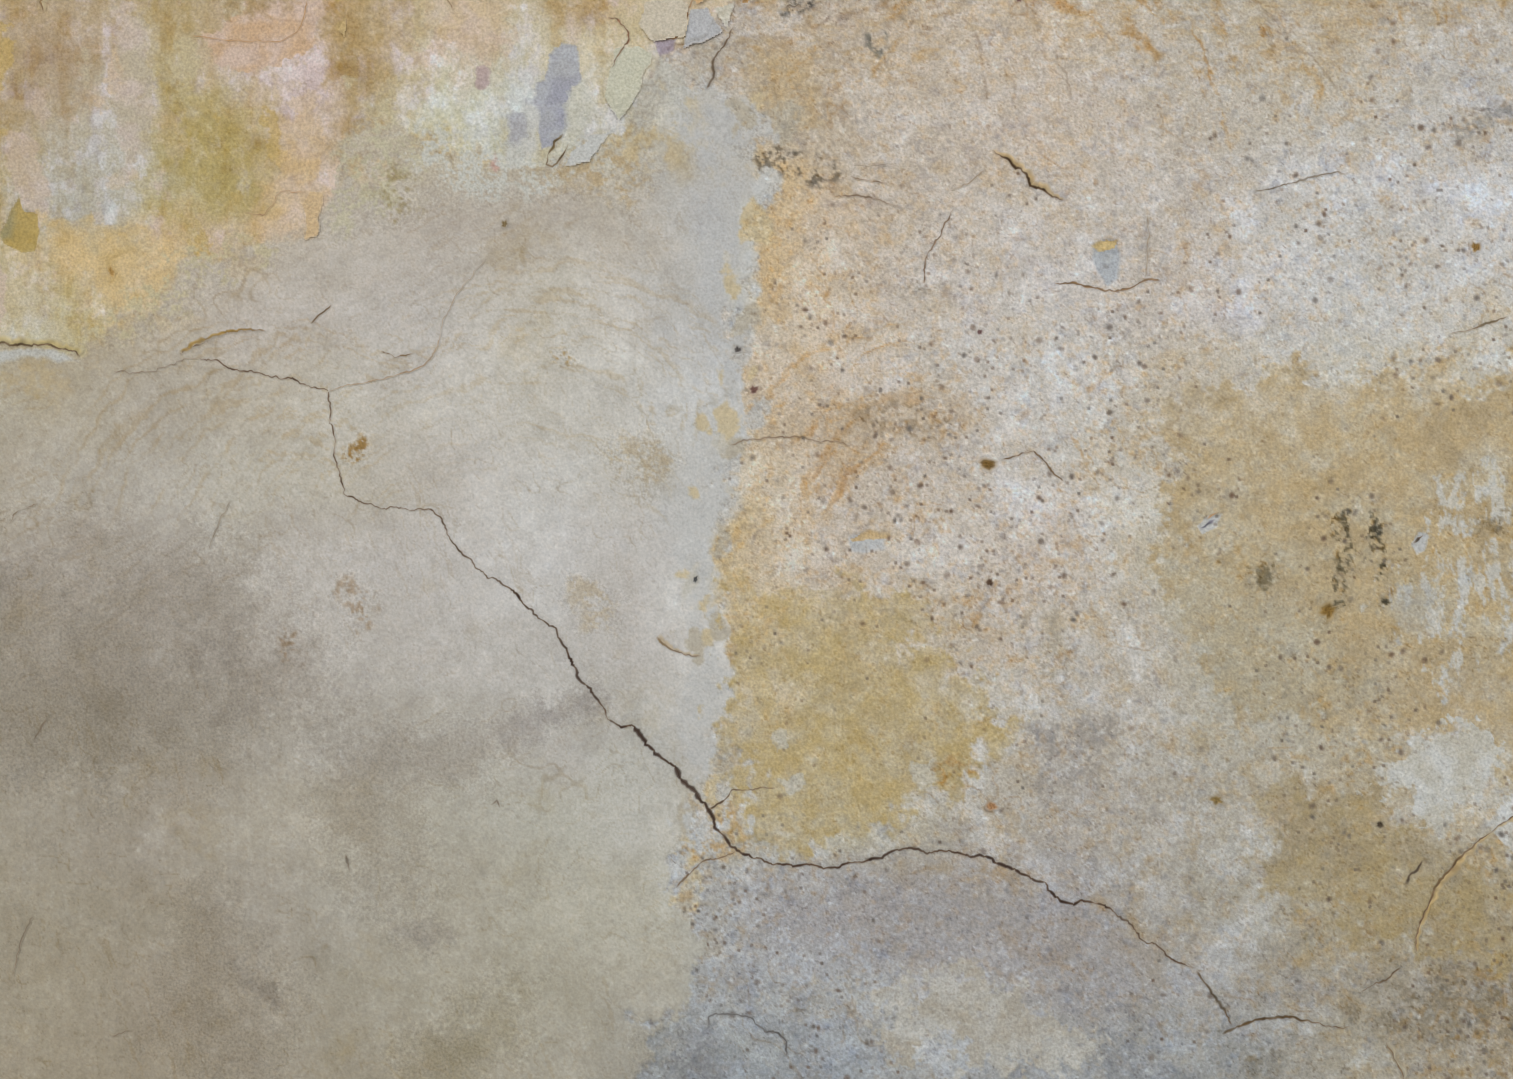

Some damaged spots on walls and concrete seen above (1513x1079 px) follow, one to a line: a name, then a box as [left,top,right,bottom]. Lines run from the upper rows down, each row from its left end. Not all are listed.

crack [608,0,694,68]
crack [706,0,746,89]
peeling [0,0,749,367]
crack [545,133,568,168]
crack [923,148,1065,284]
crack [1254,171,1346,192]
crack [0,334,84,357]
leakage [1467,505,1513,537]
leakage [1244,561,1286,596]
mould [1328,508,1393,615]
crack [114,261,1513,1036]
crack [706,1012,788,1057]